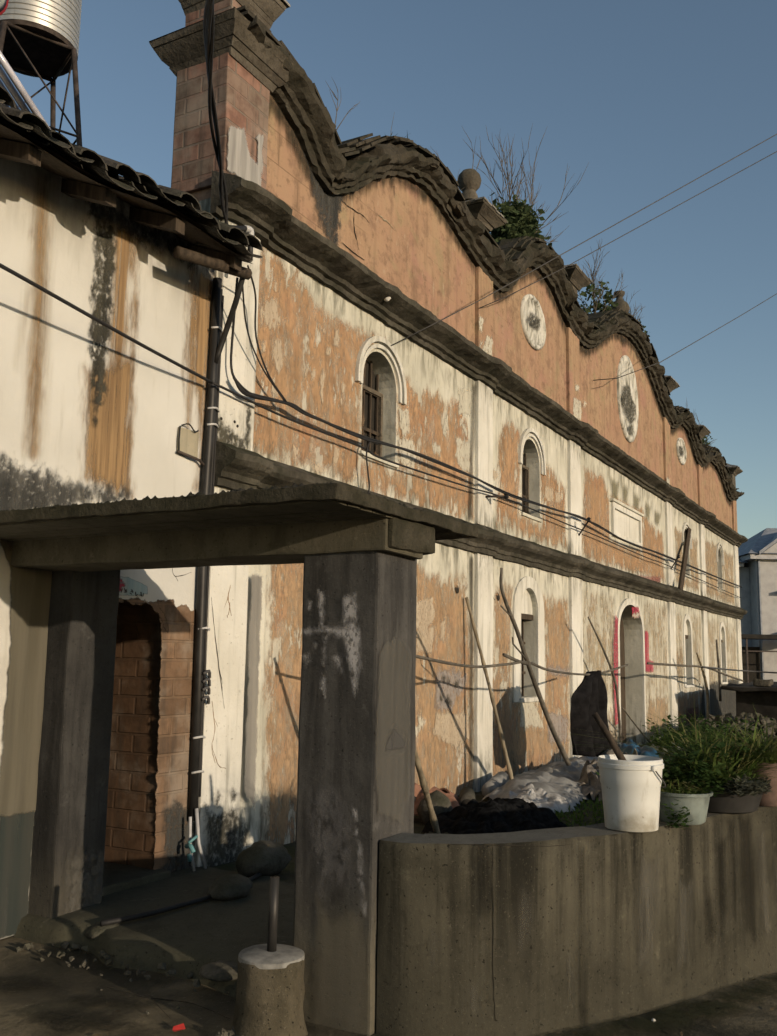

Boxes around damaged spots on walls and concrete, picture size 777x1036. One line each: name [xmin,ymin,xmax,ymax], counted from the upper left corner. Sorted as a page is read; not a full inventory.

crack [343,202,394,260]
corrosion [31,208,44,428]
corrosion [85,227,138,493]
mould [88,201,194,425]
water stain [0,454,130,511]
peeling [398,409,417,473]
peeling [432,388,473,472]
peeling [416,598,446,653]
crack [211,589,232,769]
flaking render [119,597,196,871]
peeling [520,702,568,743]
mould [161,792,248,872]